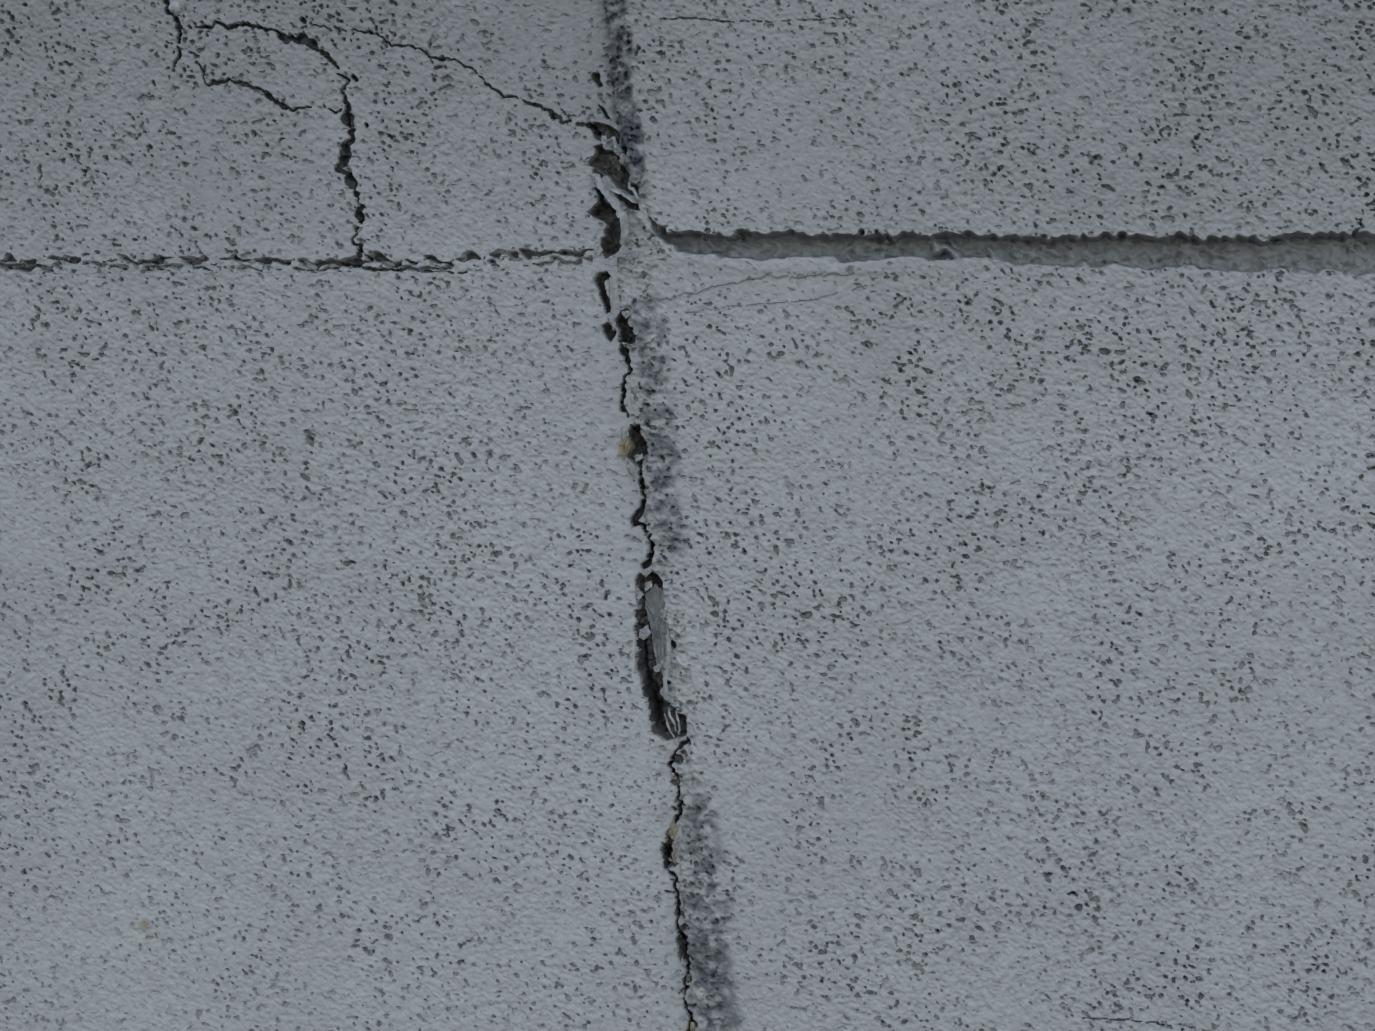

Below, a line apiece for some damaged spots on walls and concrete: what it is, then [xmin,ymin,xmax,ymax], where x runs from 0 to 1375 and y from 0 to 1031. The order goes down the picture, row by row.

crack [6,255,81,271]
crack [124,0,604,274]
crack [660,16,843,24]
crack [660,739,697,1031]